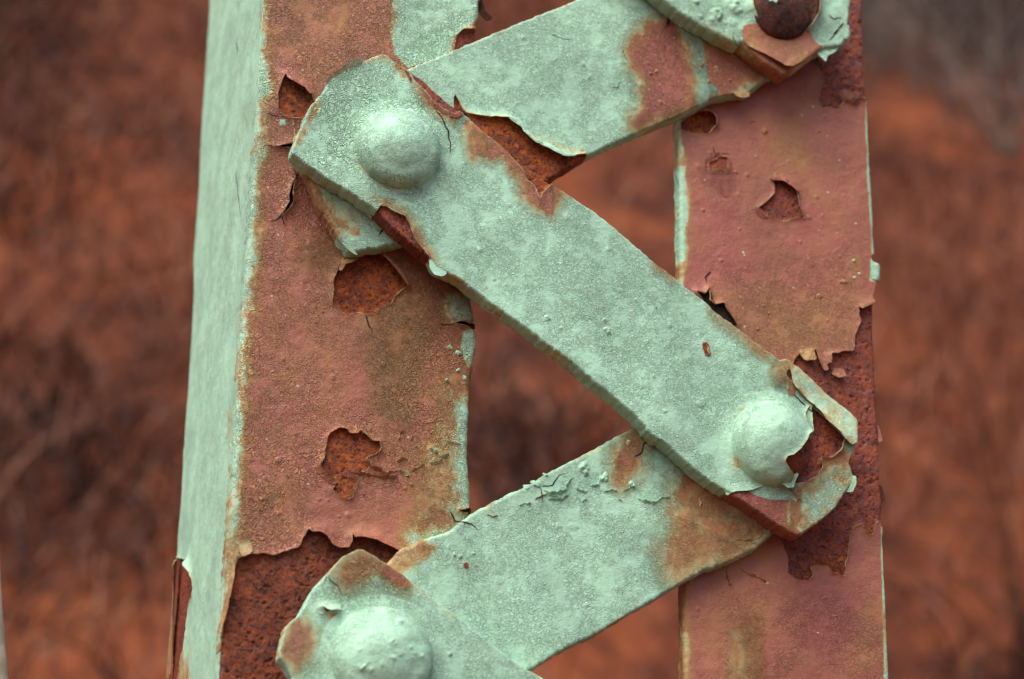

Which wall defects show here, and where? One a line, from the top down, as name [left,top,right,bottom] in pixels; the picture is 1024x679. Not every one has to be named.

corrosion [278,73,314,120]
crack [434,108,451,156]
corrosion [622,0,864,140]
corrosion [755,176,804,220]
corrosion [305,234,410,315]
corrosion [315,428,381,499]
peeling [519,478,632,506]
peeling [725,481,765,495]
corrosion [651,299,886,590]
peeling [781,364,858,488]
peeling [217,548,238,634]
peeling [321,599,341,611]